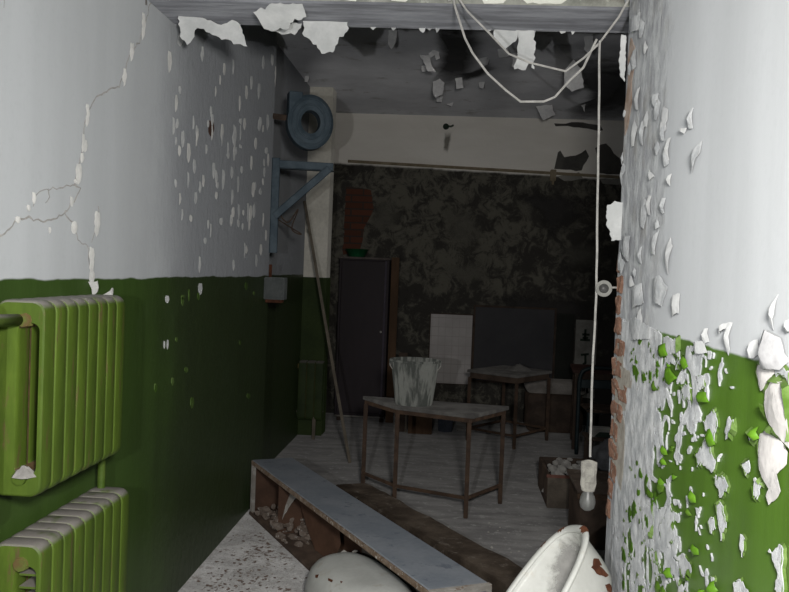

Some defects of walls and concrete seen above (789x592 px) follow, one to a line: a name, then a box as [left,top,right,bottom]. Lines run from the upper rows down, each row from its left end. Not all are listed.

peeling [178,16,247,46]
peeling [253,3,349,54]
crack [0,0,152,282]
peeling [173,76,269,267]
peeling [420,50,454,106]
peeling [536,105,603,131]
peeling [564,59,584,91]
peeling [554,144,625,185]
flaking render [619,9,672,185]
flaking render [680,107,694,133]
spalling [181,283,202,306]
flaking render [598,195,789,592]